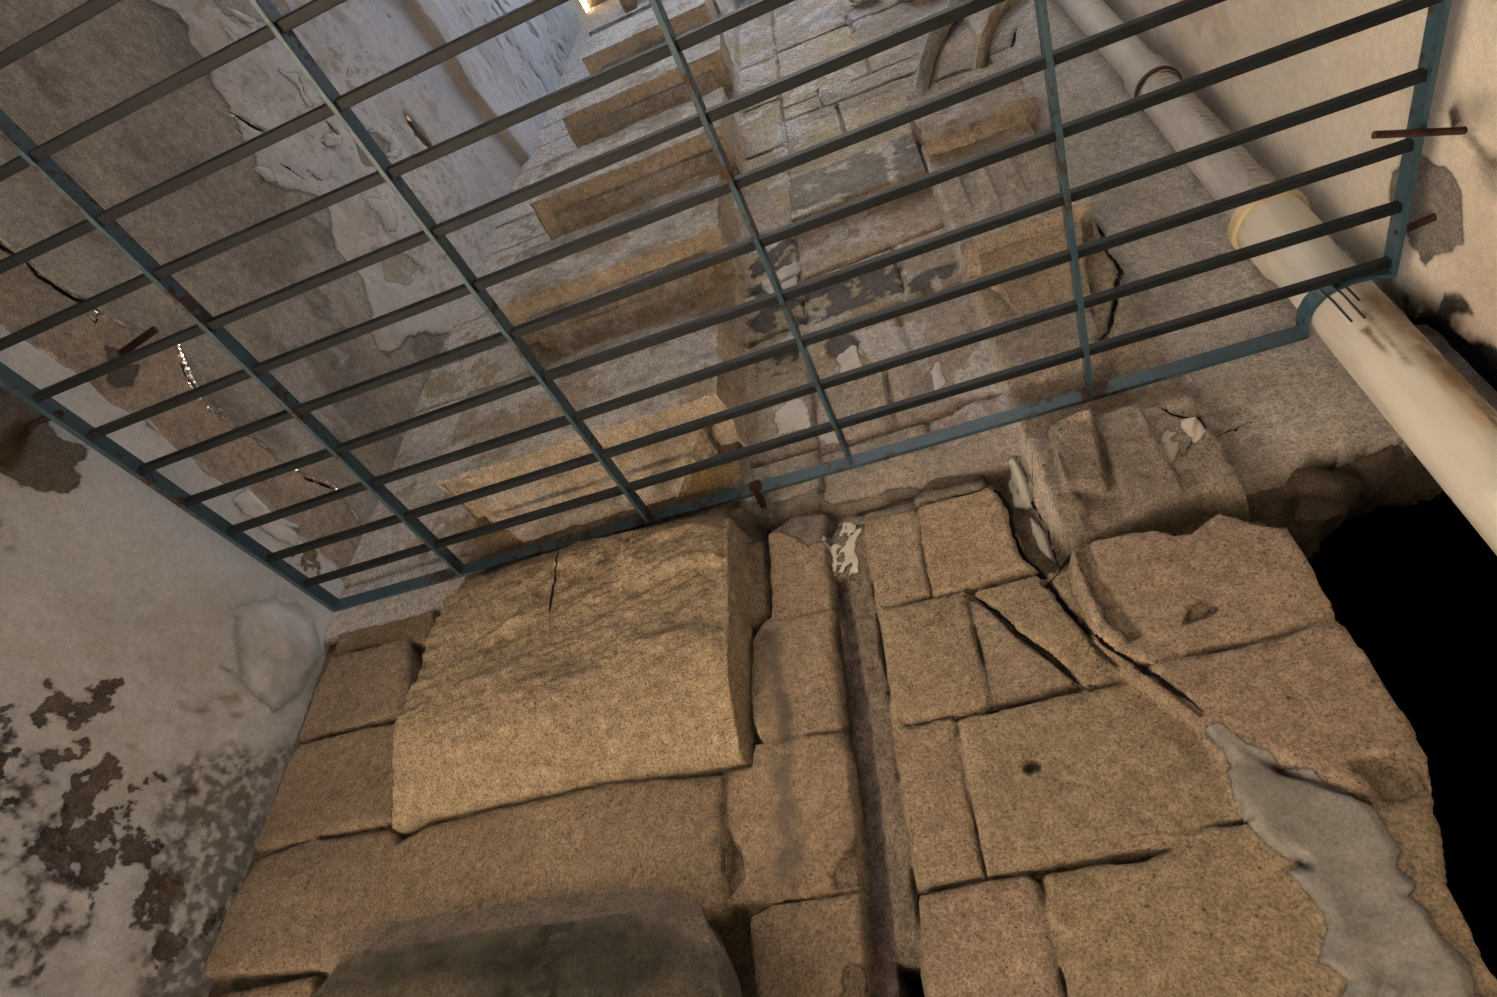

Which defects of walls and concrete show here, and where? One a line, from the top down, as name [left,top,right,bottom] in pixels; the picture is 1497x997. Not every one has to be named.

flaking render [213,0,290,42]
peeling [320,106,401,166]
flaking render [382,254,422,284]
peeling [0,249,362,583]
crack [922,453,1203,712]
peeling [0,678,237,986]